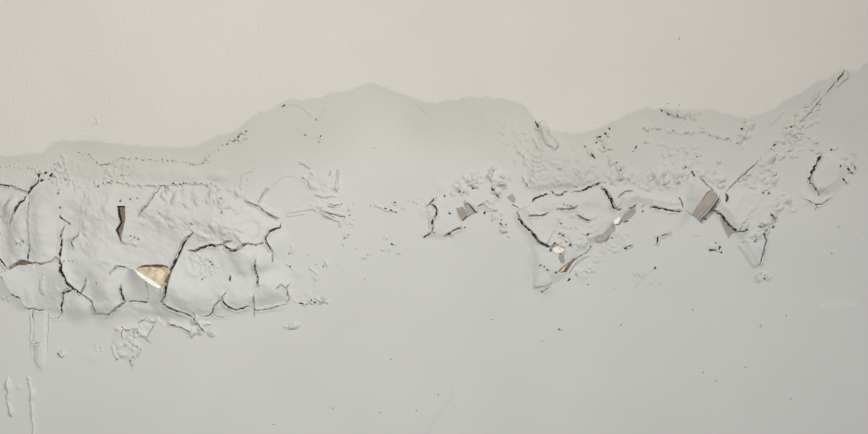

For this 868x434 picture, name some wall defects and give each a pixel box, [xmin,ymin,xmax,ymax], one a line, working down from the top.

crack [1,179,39,224]
crack [0,188,290,367]
peeling [0,159,329,340]
crack [423,198,461,238]
crack [478,177,684,258]
peeling [418,162,797,297]
crack [691,162,776,263]
crack [807,154,829,210]